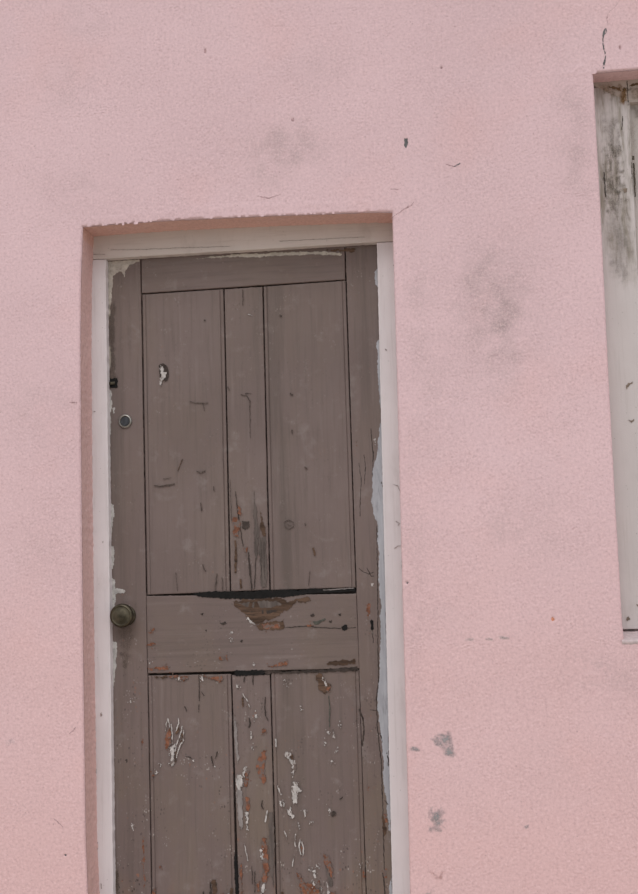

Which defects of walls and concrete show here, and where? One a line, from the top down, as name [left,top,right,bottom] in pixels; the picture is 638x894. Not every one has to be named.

crack [602,0,620,69]
crack [629,156,637,197]
peeling [159,363,169,386]
peeling [232,491,311,631]
peeling [316,659,356,765]
peeling [150,718,194,780]
peeling [203,664,336,894]